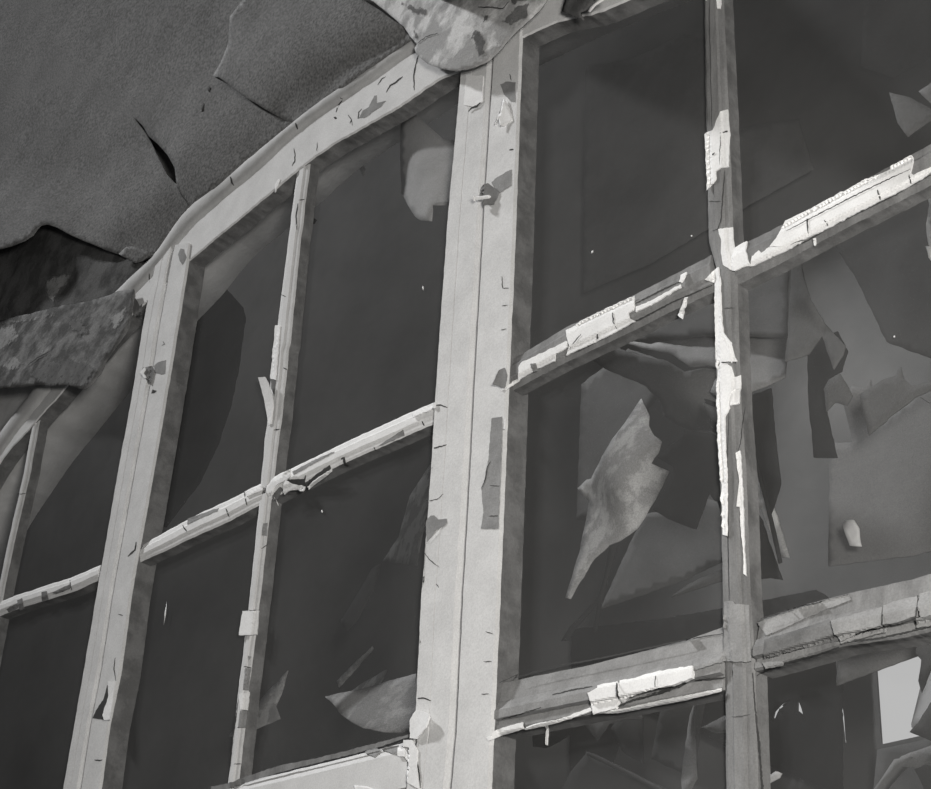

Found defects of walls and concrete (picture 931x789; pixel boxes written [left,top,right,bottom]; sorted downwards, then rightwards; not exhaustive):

peeling [0,0,547,393]
peeling [258,325,281,425]
peeling [412,403,436,418]
peeling [481,417,507,529]
peeling [492,33,931,609]
peeling [486,590,931,789]